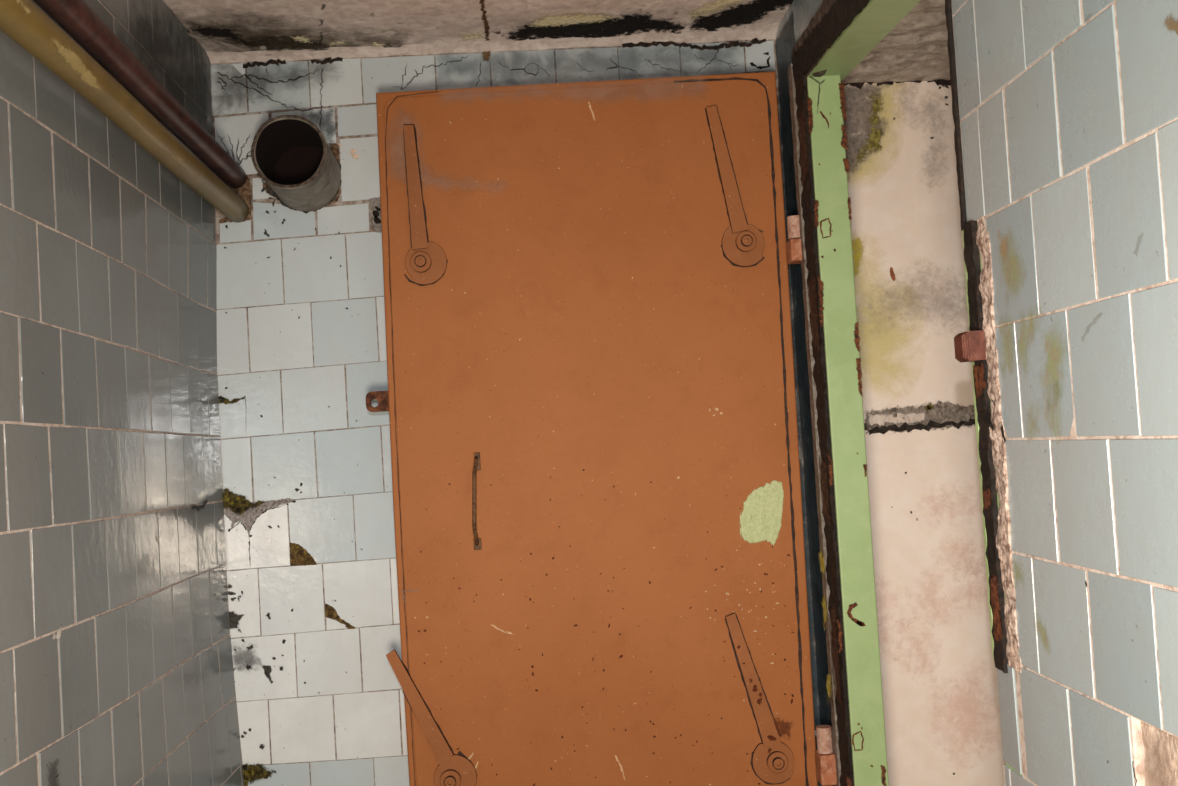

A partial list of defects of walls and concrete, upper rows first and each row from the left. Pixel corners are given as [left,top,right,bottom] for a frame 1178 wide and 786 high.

water stain [186,18,404,52]
crack [217,4,326,131]
crack [392,55,549,90]
crack [577,49,771,79]
water stain [843,84,890,173]
crack [216,130,266,183]
water stain [852,238,862,275]
spalling [963,217,1022,673]
spalling [224,498,296,560]
spalling [289,542,317,566]
spalling [325,604,355,629]
flaking render [1132,721,1178,786]